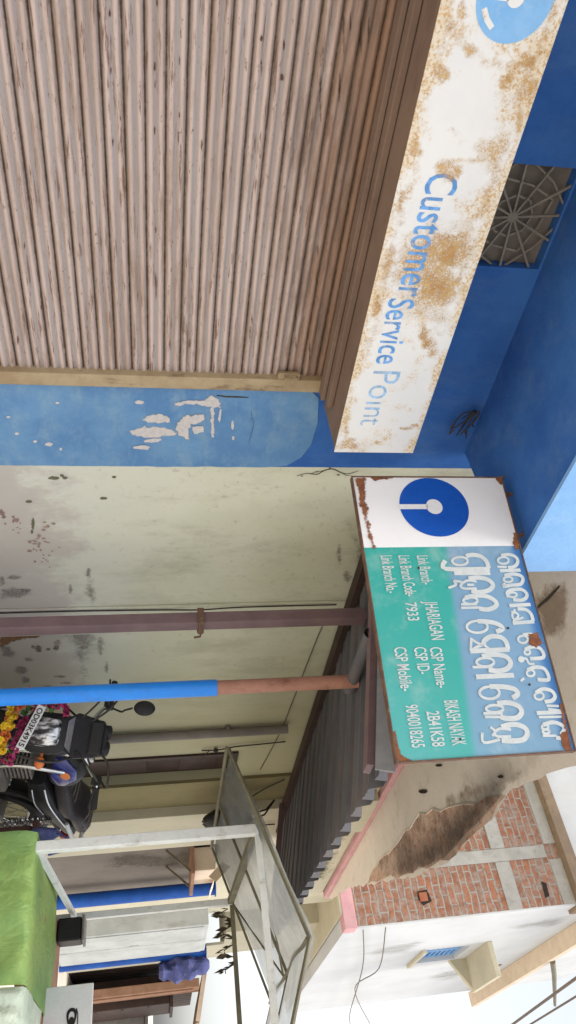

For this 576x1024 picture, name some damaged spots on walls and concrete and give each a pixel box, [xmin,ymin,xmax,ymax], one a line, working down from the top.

peeling [129,396,235,450]
crack [298,468,357,477]
flaking render [368,796,505,883]